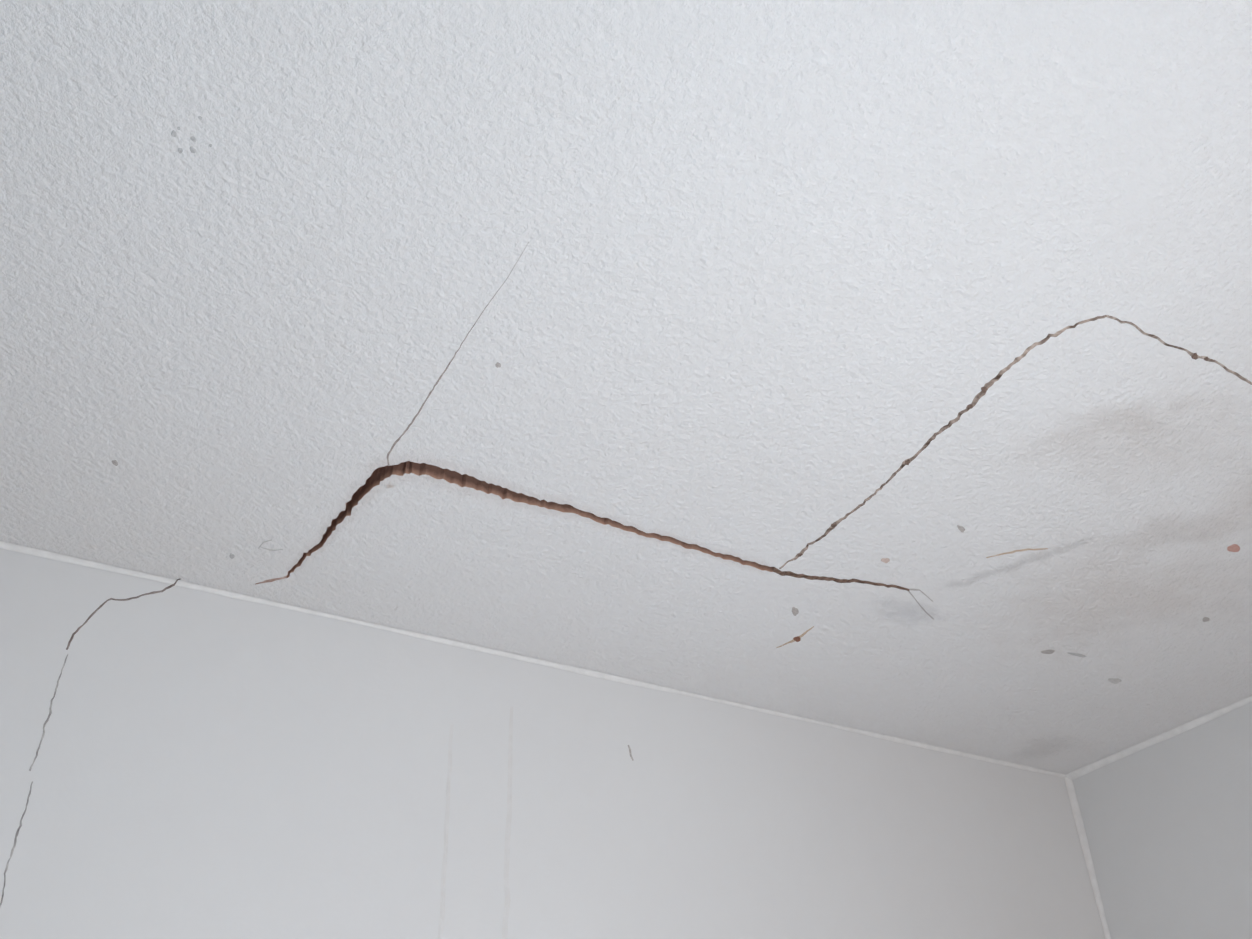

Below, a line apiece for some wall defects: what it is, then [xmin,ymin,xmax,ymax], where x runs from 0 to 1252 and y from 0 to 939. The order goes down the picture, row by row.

crack [255,242,1252,591]
crack [0,579,181,907]